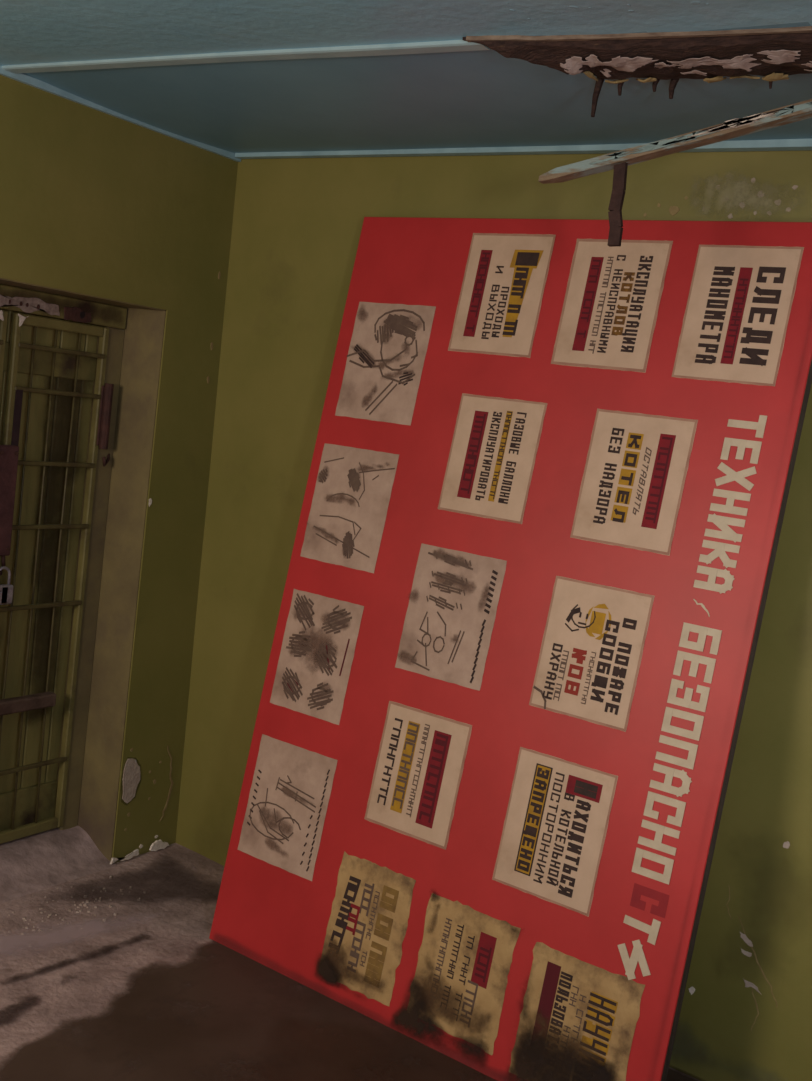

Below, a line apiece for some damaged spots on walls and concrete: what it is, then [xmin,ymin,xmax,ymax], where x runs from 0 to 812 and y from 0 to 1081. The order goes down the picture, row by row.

peeling [560,50,812,84]
peeling [687,113,775,138]
flaking render [120,746,174,831]